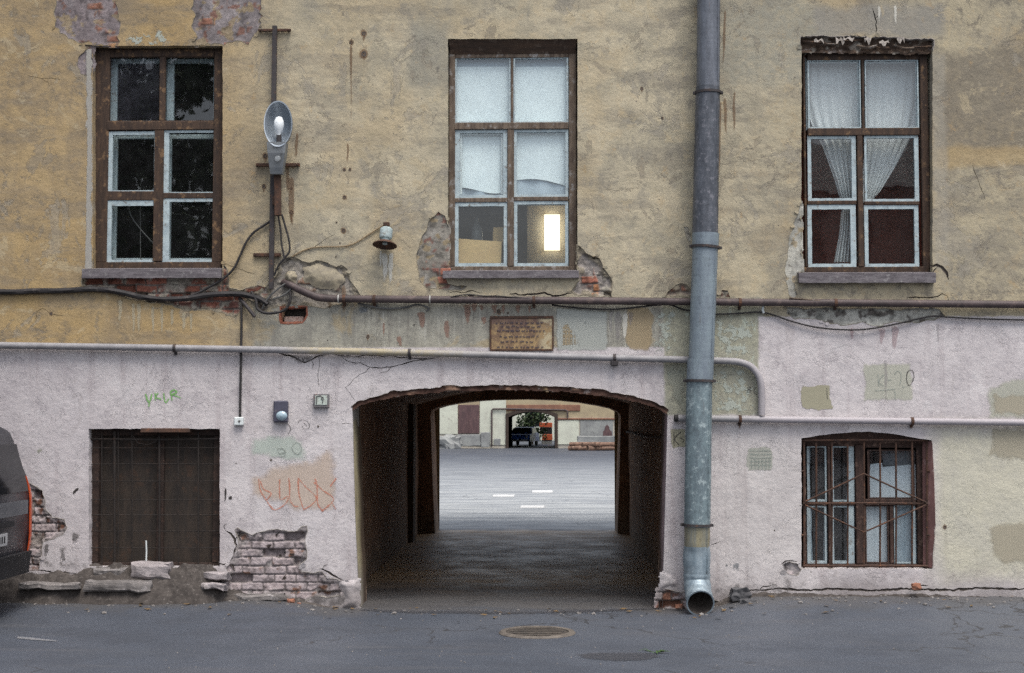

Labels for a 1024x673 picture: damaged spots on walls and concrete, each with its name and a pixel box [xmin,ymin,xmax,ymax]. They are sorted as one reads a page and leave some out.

flaking render [797,32,935,55]
flaking render [52,0,360,324]
flaking render [416,211,467,293]
flaking render [571,243,613,297]
flaking render [784,201,945,326]
crack [279,353,439,424]
flaking render [29,483,67,571]
flaking render [224,526,349,601]